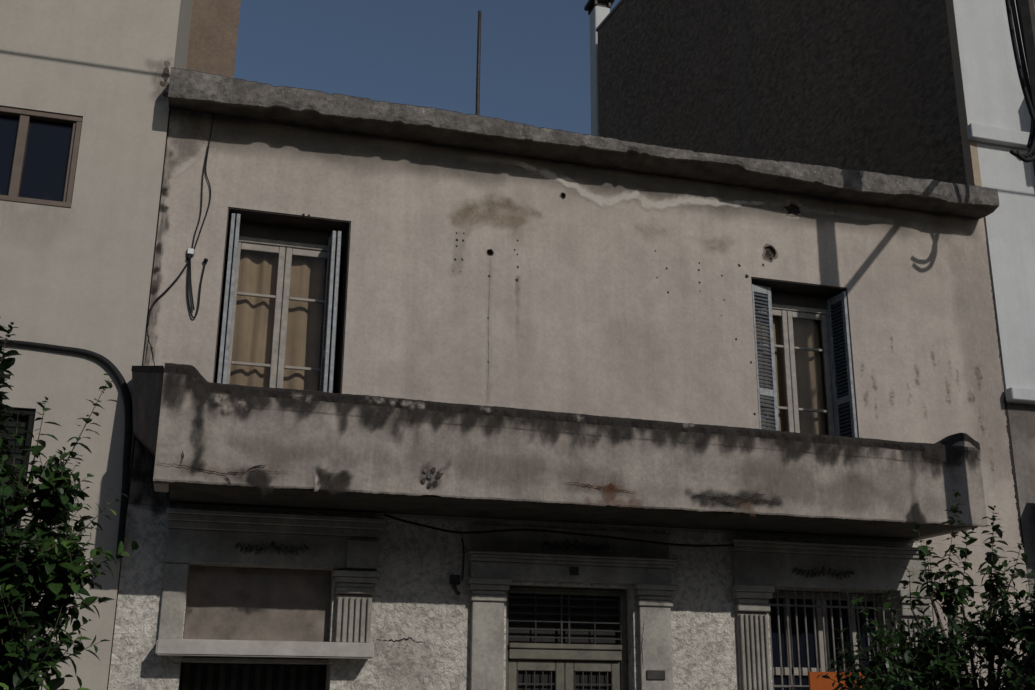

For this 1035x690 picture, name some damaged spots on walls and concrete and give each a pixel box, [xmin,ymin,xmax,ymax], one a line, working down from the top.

damp [165,117,955,229]
spalling [784,201,802,217]
spalling [762,243,778,263]
damp [150,243,161,302]
damp [164,364,980,474]
crack [157,451,284,485]
damp [315,468,353,493]
spalling [421,464,444,488]